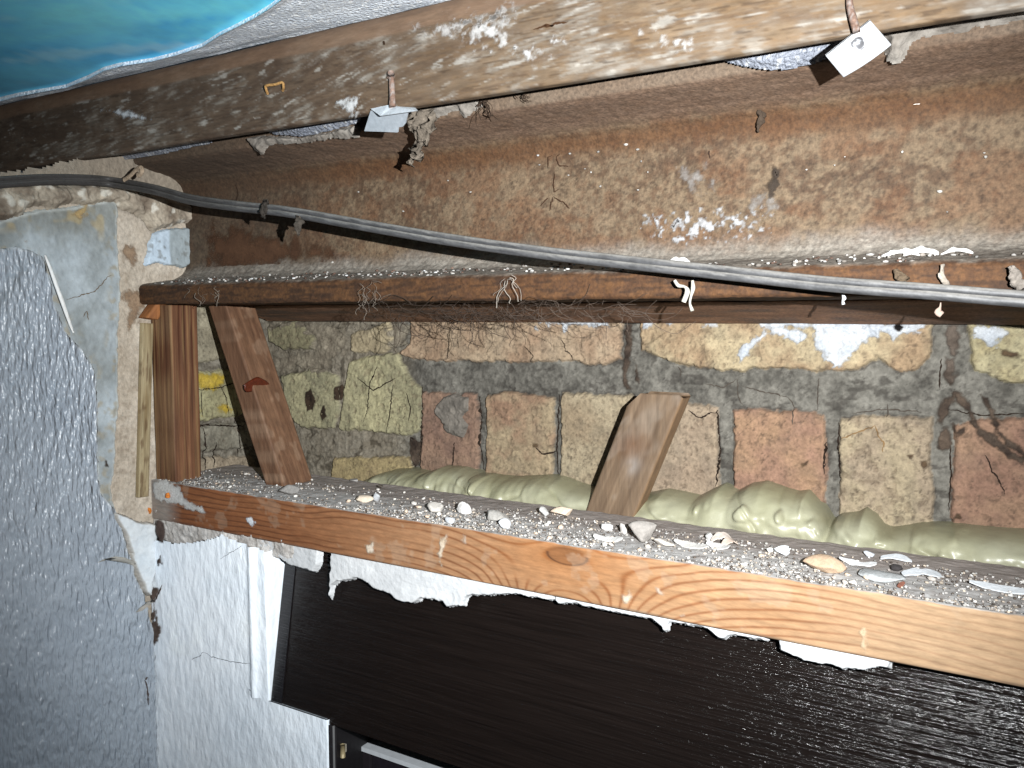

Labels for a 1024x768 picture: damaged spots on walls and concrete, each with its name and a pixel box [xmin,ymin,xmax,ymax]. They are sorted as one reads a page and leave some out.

rust [767,168,779,198]
rust [207,226,333,267]
leakage [737,323,925,367]
peeling [0,185,294,612]
crack [359,367,423,467]
crack [946,448,954,509]
crack [985,455,1005,494]